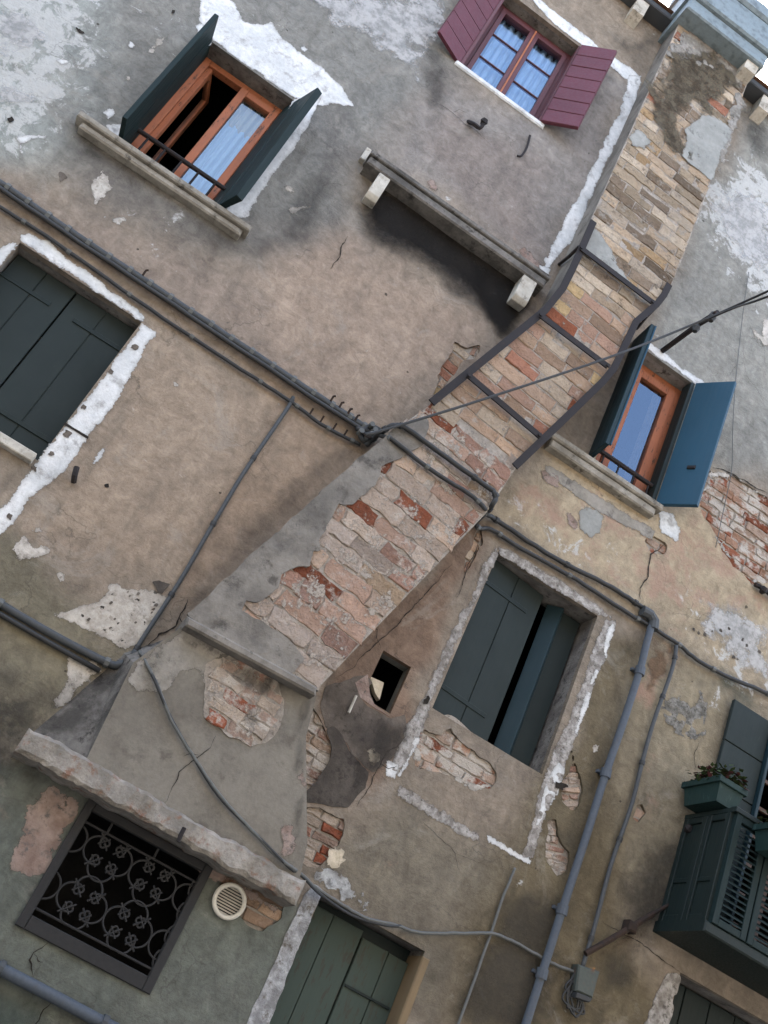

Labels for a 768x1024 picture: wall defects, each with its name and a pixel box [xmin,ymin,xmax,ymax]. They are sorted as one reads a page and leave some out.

peeling [533,0,598,47]
water stain [645,51,740,160]
spalling [242,25,745,875]
crack [639,543,665,597]
spalling [698,471,768,585]
spalling [54,583,166,650]
peeling [693,608,768,677]
spalling [203,656,284,747]
crack [167,739,214,800]
spalling [10,785,79,877]